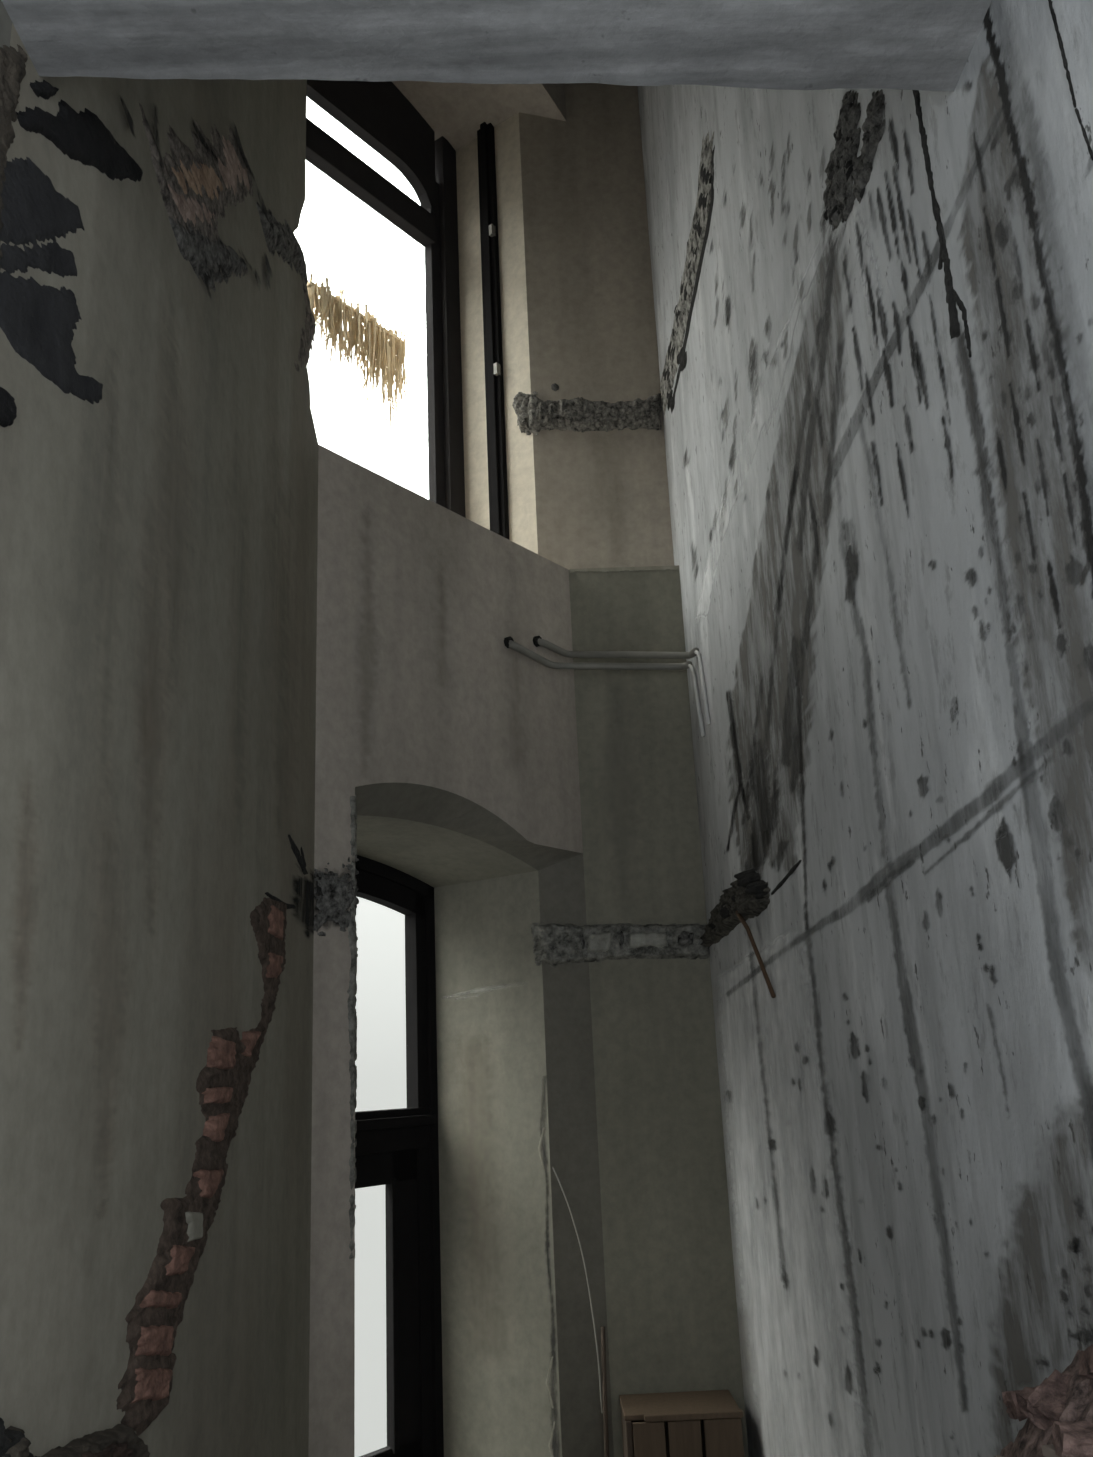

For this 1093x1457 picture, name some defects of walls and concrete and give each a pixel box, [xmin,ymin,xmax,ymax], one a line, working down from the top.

peeling [0,387,17,428]
peeling [0,44,316,404]
spalling [512,132,726,436]
spalling [808,89,885,231]
spalling [531,869,776,998]
flaking render [0,795,359,1457]